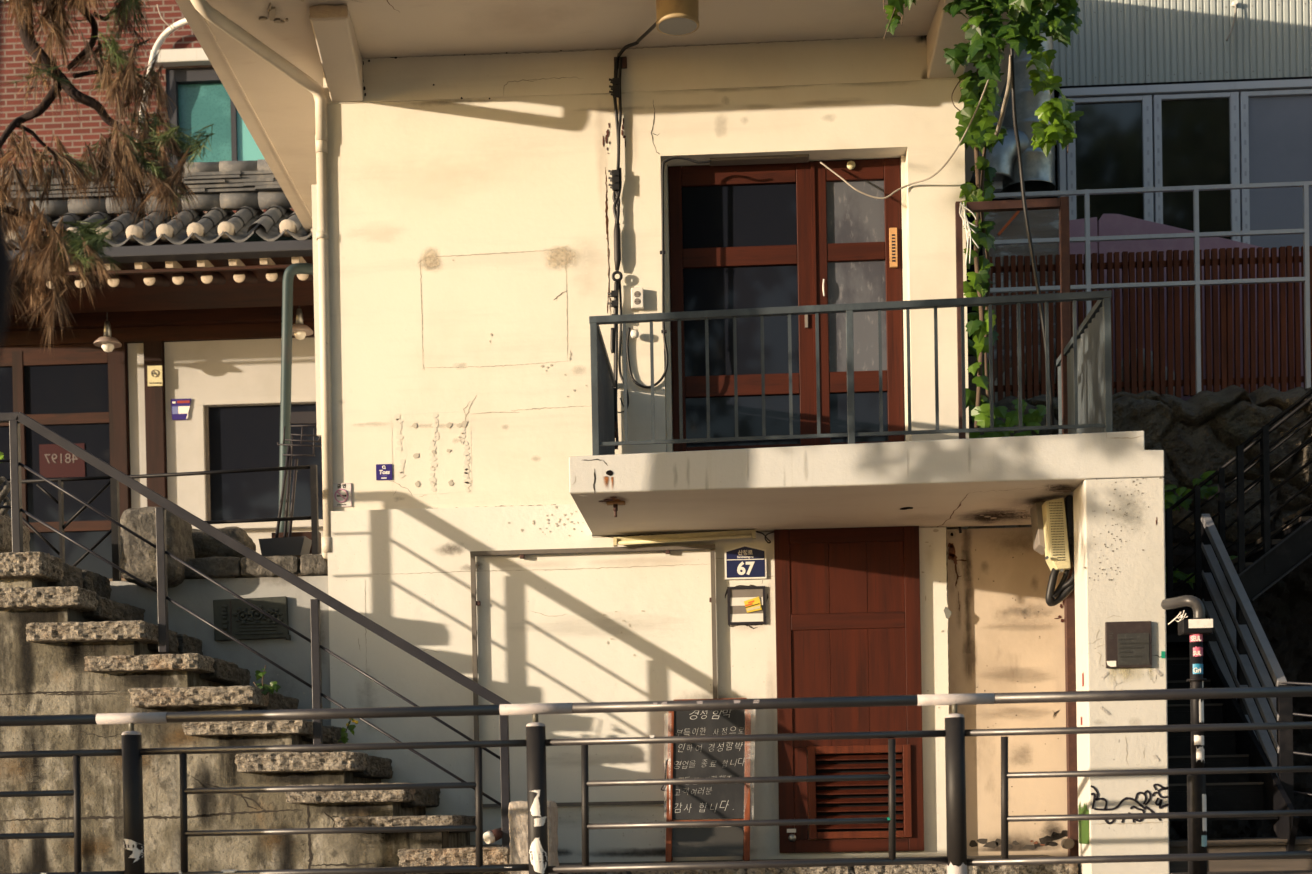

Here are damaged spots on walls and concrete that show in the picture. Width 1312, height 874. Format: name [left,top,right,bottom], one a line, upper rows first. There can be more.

water stain [1084,477,1162,581]
water stain [8,610,60,699]
water stain [965,547,973,669]
water stain [22,826,48,873]